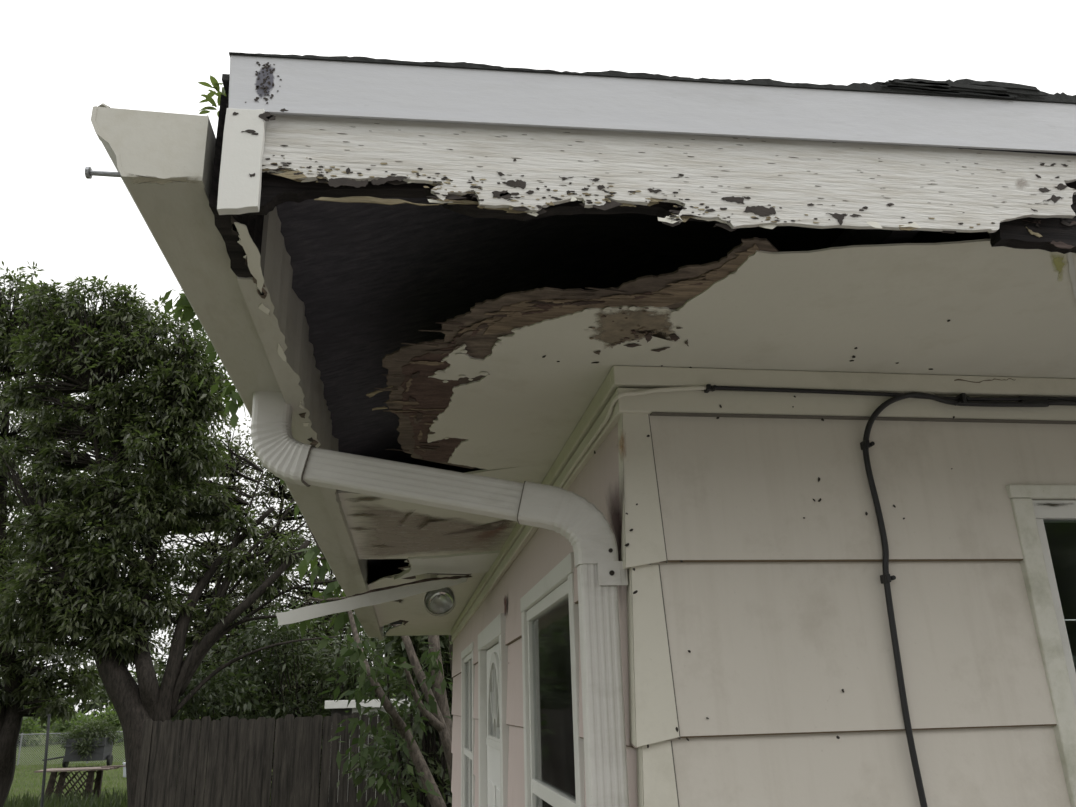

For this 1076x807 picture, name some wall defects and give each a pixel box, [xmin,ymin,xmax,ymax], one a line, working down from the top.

peeling [258,108,289,121]
peeling [250,145,883,232]
peeling [899,217,934,231]
peeling [1023,162,1076,229]